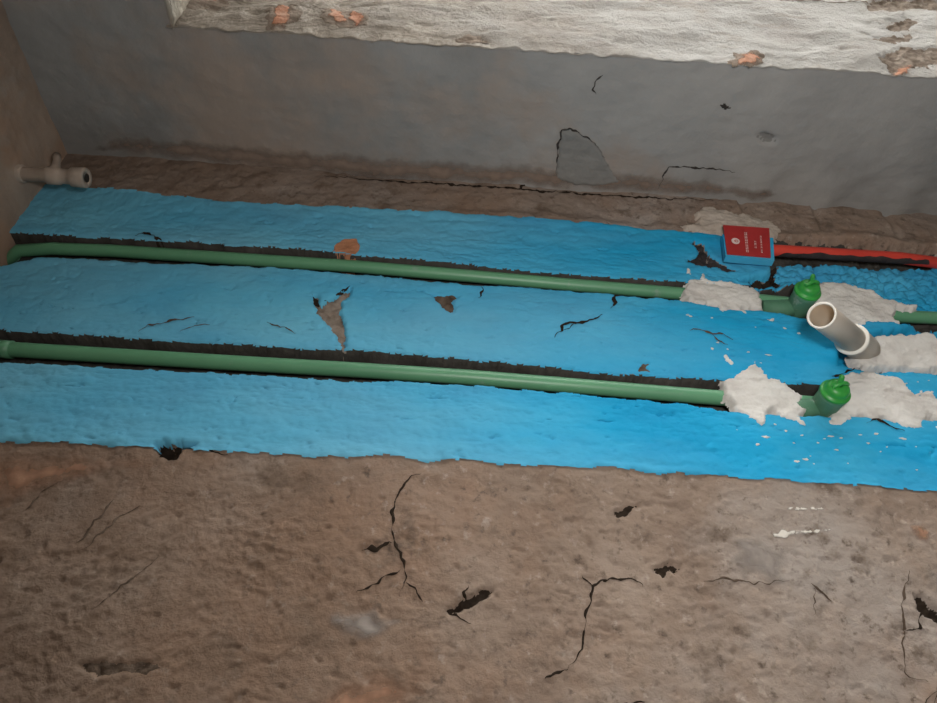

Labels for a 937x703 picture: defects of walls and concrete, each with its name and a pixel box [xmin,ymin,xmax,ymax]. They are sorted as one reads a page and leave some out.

spalling [867,0,937,76]
crack [357,474,423,602]
crack [545,576,643,678]
crack [901,571,937,703]